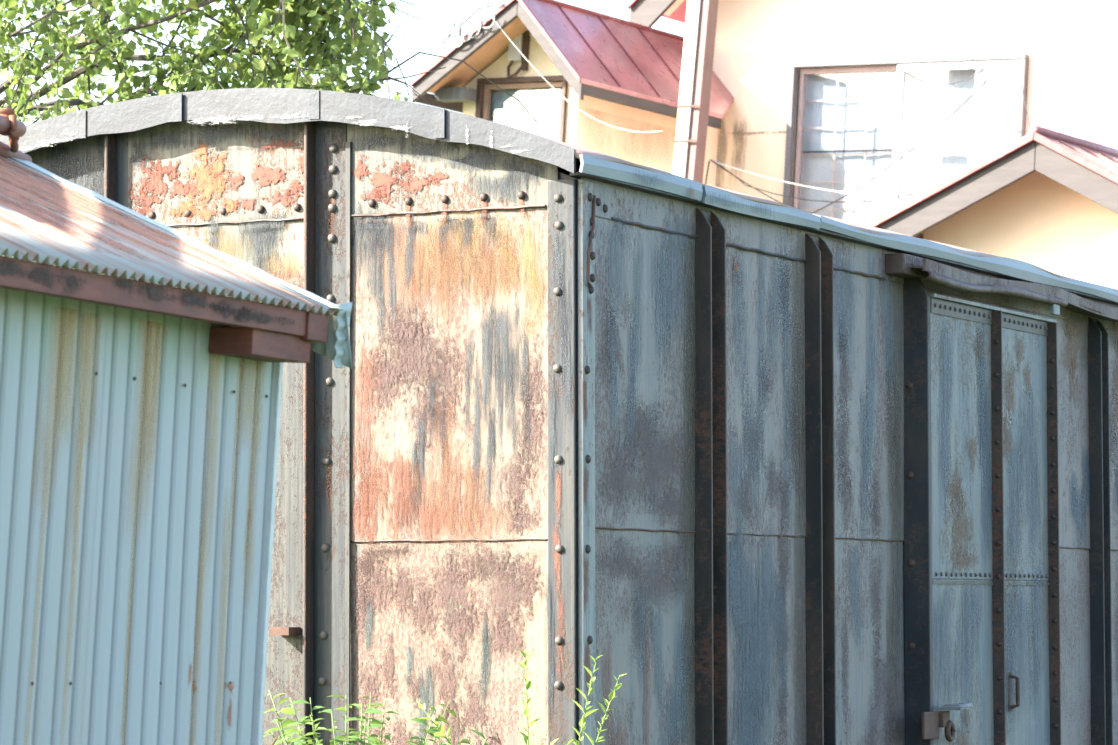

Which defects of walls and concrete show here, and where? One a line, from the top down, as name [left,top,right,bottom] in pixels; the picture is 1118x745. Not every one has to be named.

rust [0,156,306,301]
rust [350,349,508,543]
rust [947,440,976,574]